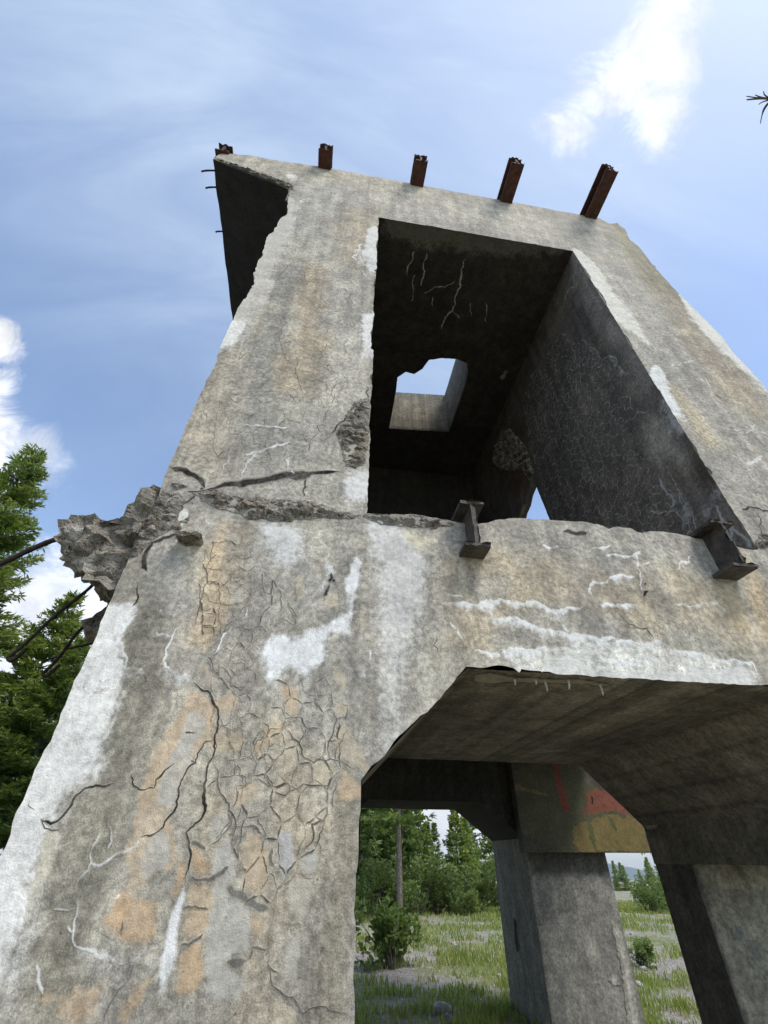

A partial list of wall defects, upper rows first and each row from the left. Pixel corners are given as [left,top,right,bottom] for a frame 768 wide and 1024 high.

crack [132,256,370,607]
spalling [336,397,371,469]
spalling [492,428,534,482]
spalling [41,626,94,678]
leakage [247,466,446,782]
leakage [470,582,768,688]
crack [28,534,354,1024]